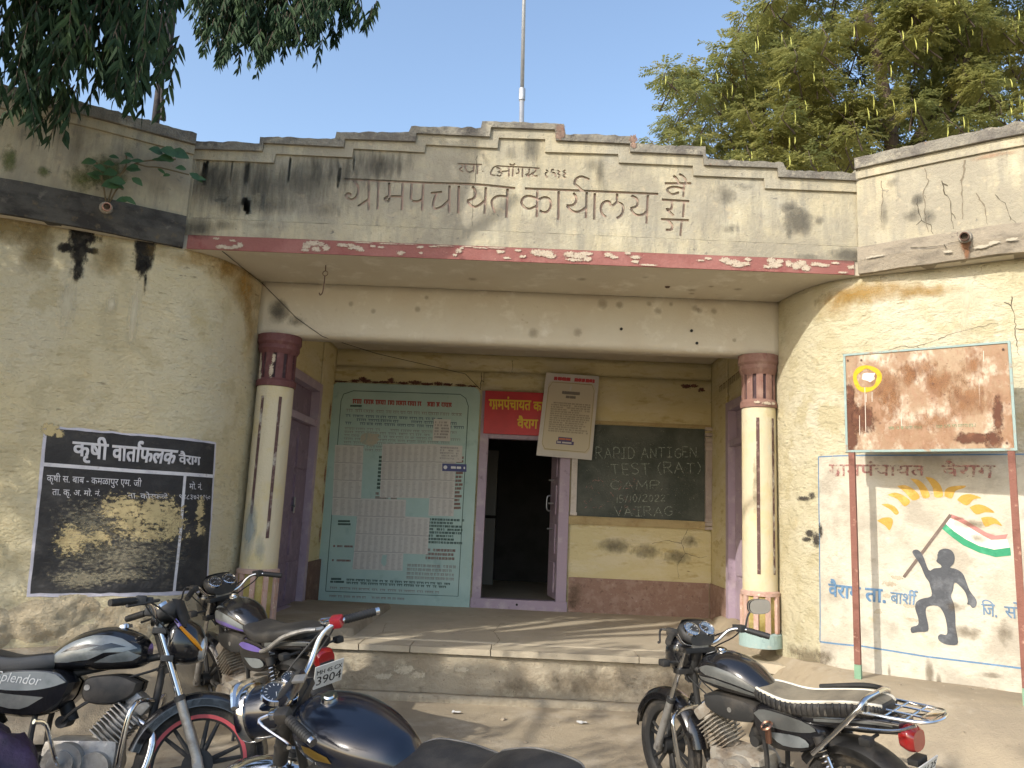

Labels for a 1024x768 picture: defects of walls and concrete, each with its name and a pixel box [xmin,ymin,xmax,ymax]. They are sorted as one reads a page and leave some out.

crack [911,160,1016,248]
water stain [786,206,808,231]
water stain [0,220,115,312]
peeling [301,239,384,252]
peeling [453,247,656,266]
peeling [974,237,1019,249]
water stain [131,240,156,332]
peeling [258,353,276,379]
water stain [802,523,822,546]